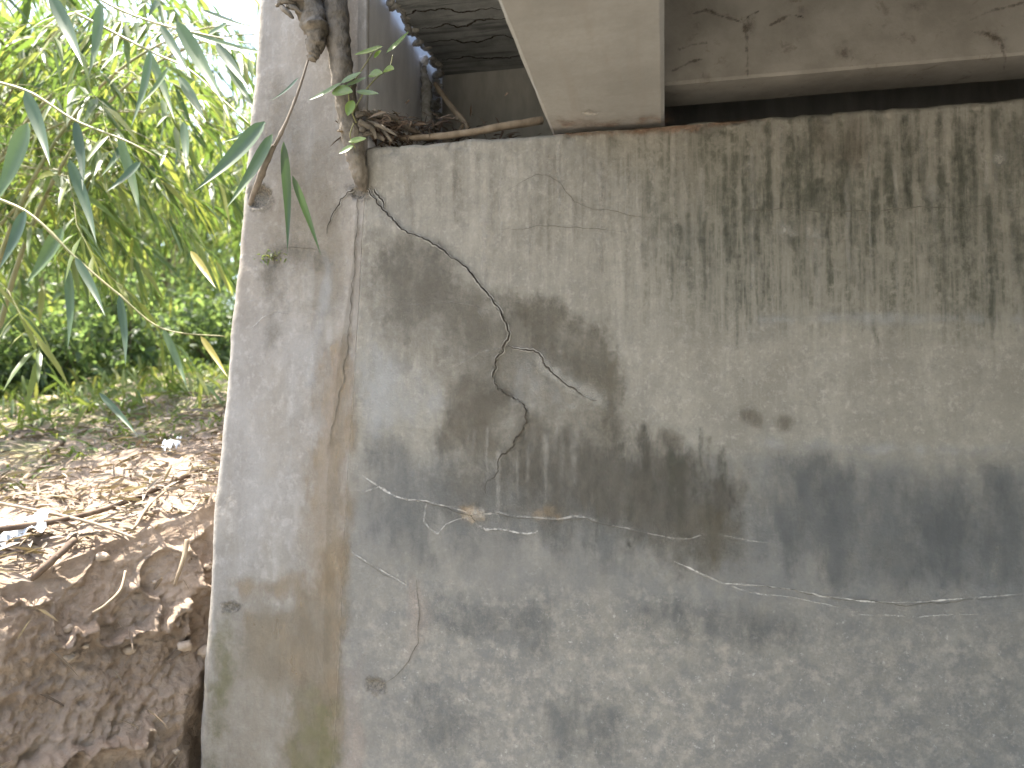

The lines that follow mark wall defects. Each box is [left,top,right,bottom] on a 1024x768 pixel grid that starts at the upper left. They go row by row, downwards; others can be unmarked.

crack [281,188,701,572]
crack [725,583,1023,617]